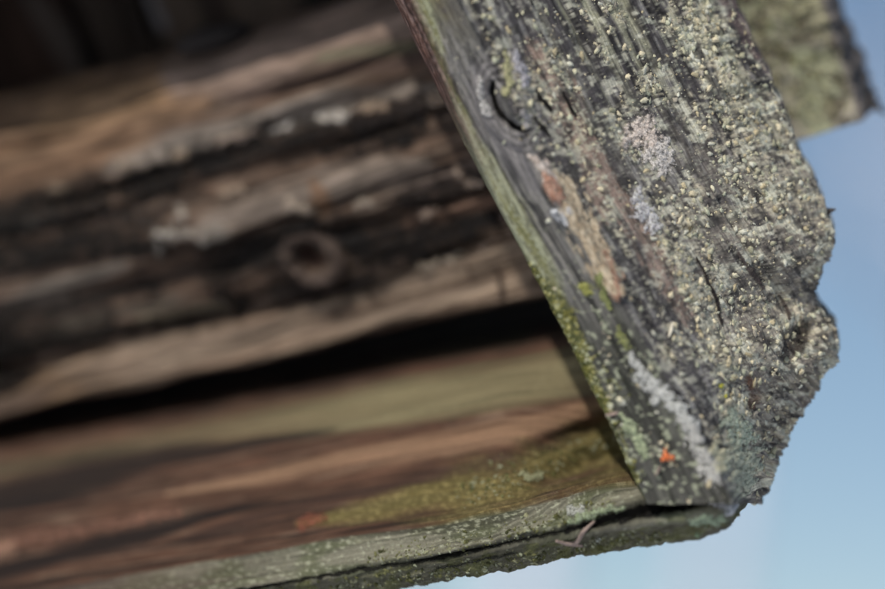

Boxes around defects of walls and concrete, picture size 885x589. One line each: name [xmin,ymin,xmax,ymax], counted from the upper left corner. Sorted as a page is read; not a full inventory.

crack [238,504,695,589]